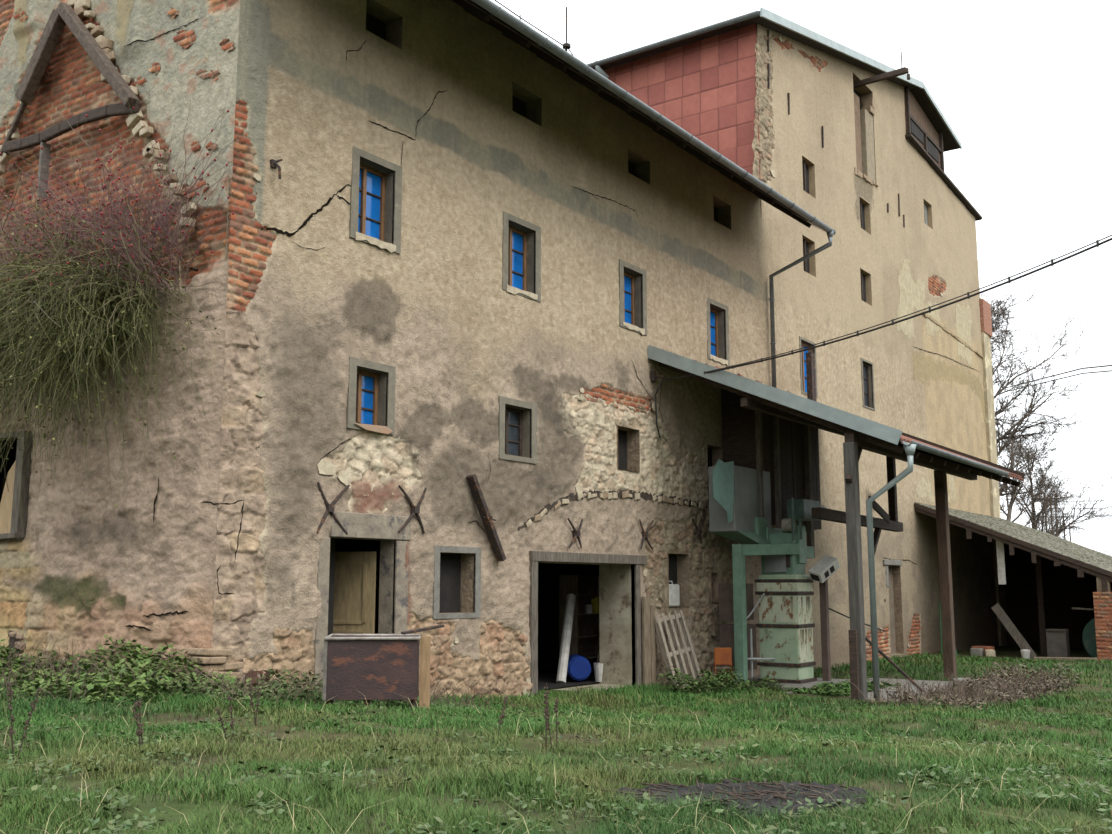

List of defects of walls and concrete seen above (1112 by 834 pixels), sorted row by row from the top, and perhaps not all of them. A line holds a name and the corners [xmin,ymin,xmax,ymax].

spalling [52,0,160,96]
crack [123,17,202,47]
spalling [167,7,196,49]
spalling [219,38,234,52]
spalling [126,109,209,227]
crack [370,90,447,166]
spalling [752,34,828,183]
crack [261,184,360,251]
peeling [897,259,947,339]
spalling [317,432,422,515]
spalling [517,384,738,679]
spalling [404,551,533,698]